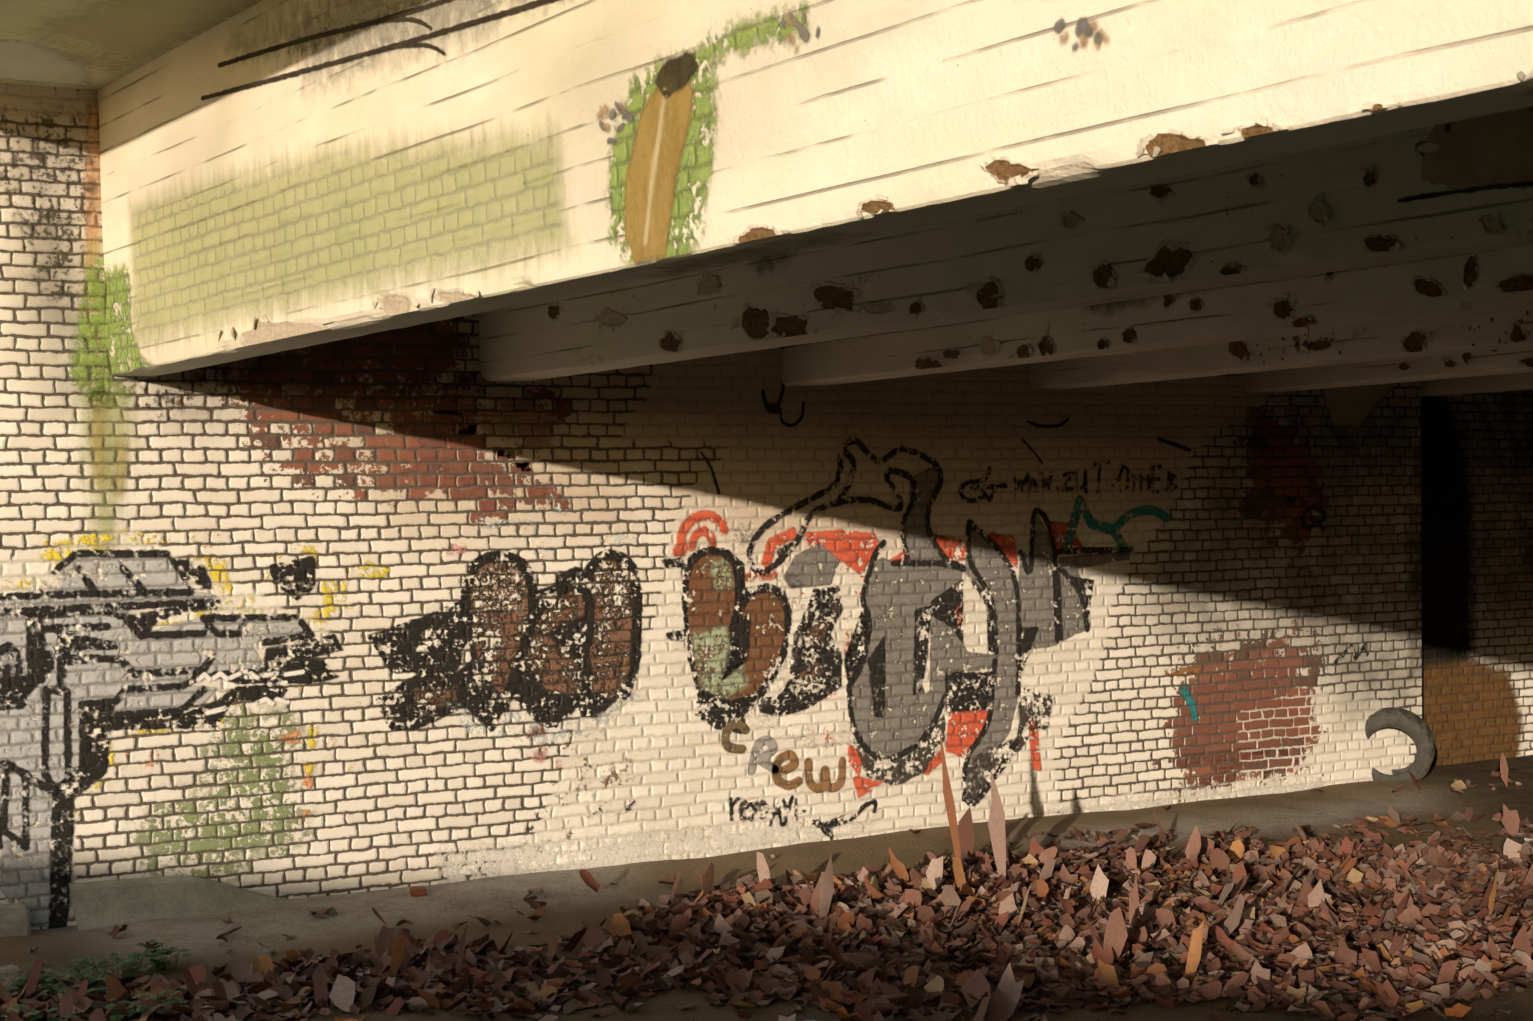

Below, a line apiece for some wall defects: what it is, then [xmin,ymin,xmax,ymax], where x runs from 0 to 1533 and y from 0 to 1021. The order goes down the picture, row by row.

crack [201,0,555,101]
spalling [1361,101,1403,112]
peeling [1408,106,1533,190]
crack [1397,181,1533,203]
water stain [0,108,270,535]
water stain [134,149,560,334]
spalling [730,280,863,341]
spalling [965,276,1006,310]
spalling [1008,327,1057,359]
spalling [1136,239,1205,315]
peeling [191,288,570,528]
peeling [1152,655,1316,793]